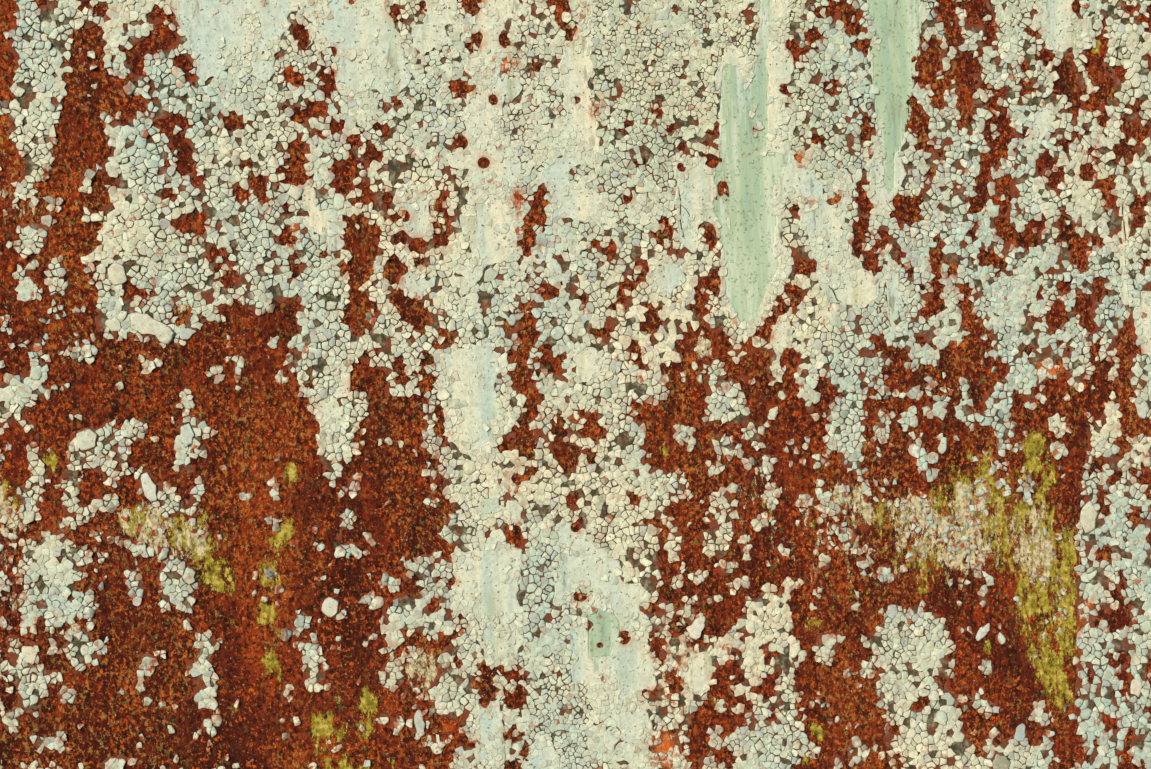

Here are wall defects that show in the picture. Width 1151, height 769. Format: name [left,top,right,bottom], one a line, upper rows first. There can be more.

peeling [12,255,68,324]
rust [511,185,550,259]
rust [590,256,666,370]
crack [678,187,690,239]
crack [1121,178,1129,296]
rust [0,0,532,769]
rust [493,281,610,485]
peeling [694,339,778,451]
peeling [705,434,782,532]
rust [621,0,1151,769]
peeling [868,406,947,482]
peeling [280,589,346,740]